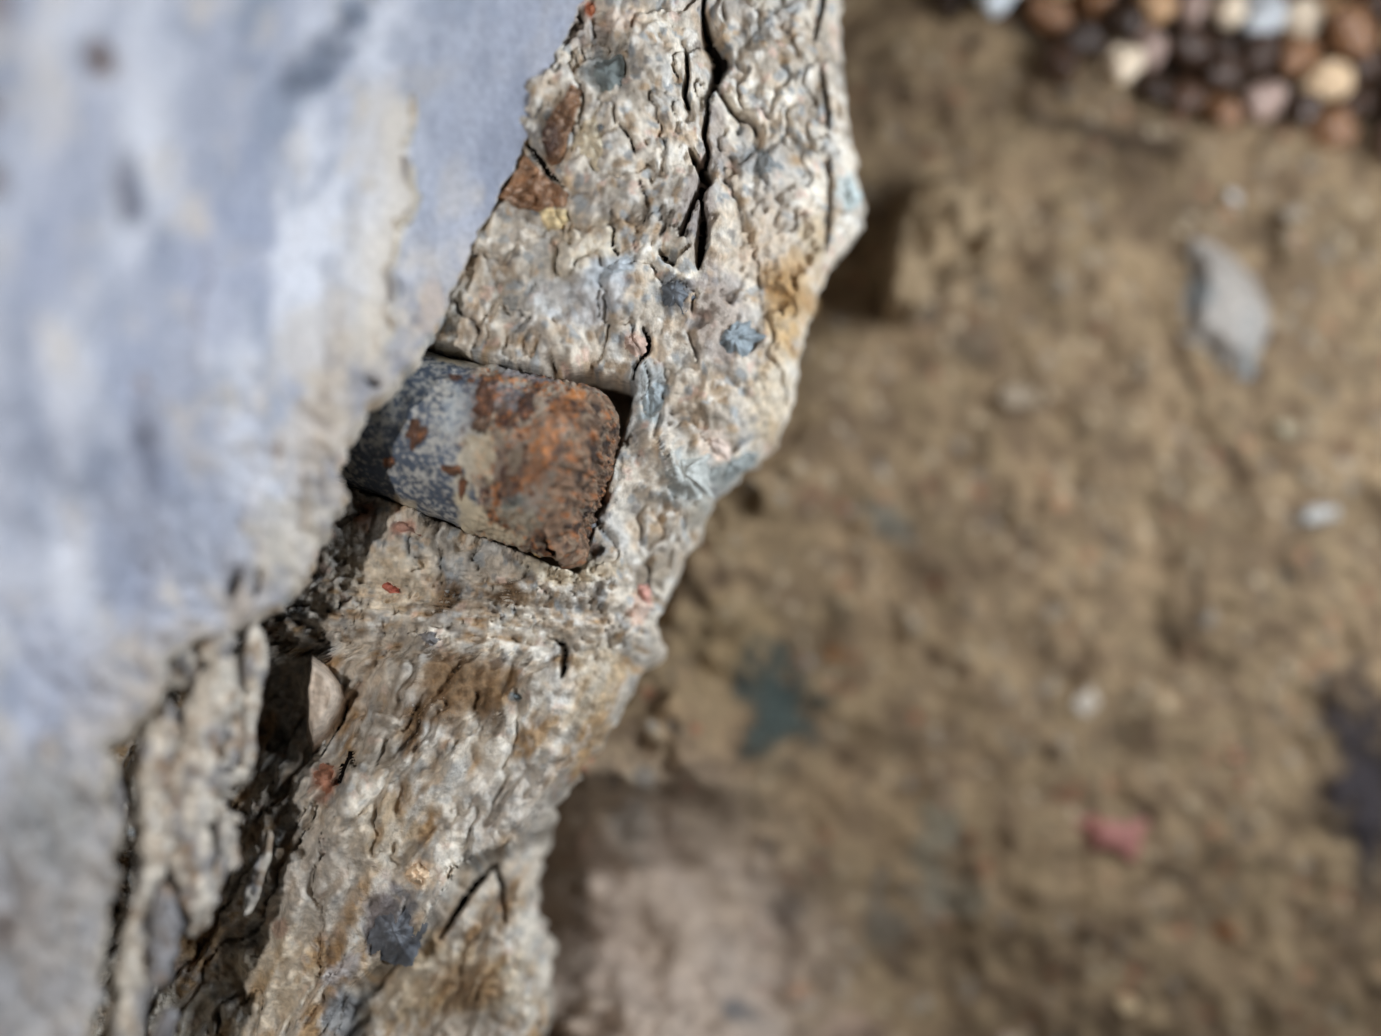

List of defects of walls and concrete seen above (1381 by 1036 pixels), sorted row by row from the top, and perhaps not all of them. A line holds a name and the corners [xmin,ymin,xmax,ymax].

crack [661,0,757,271]
crack [363,376,380,387]
spalling [88,0,865,1036]
crack [230,571,260,598]
crack [321,705,357,783]